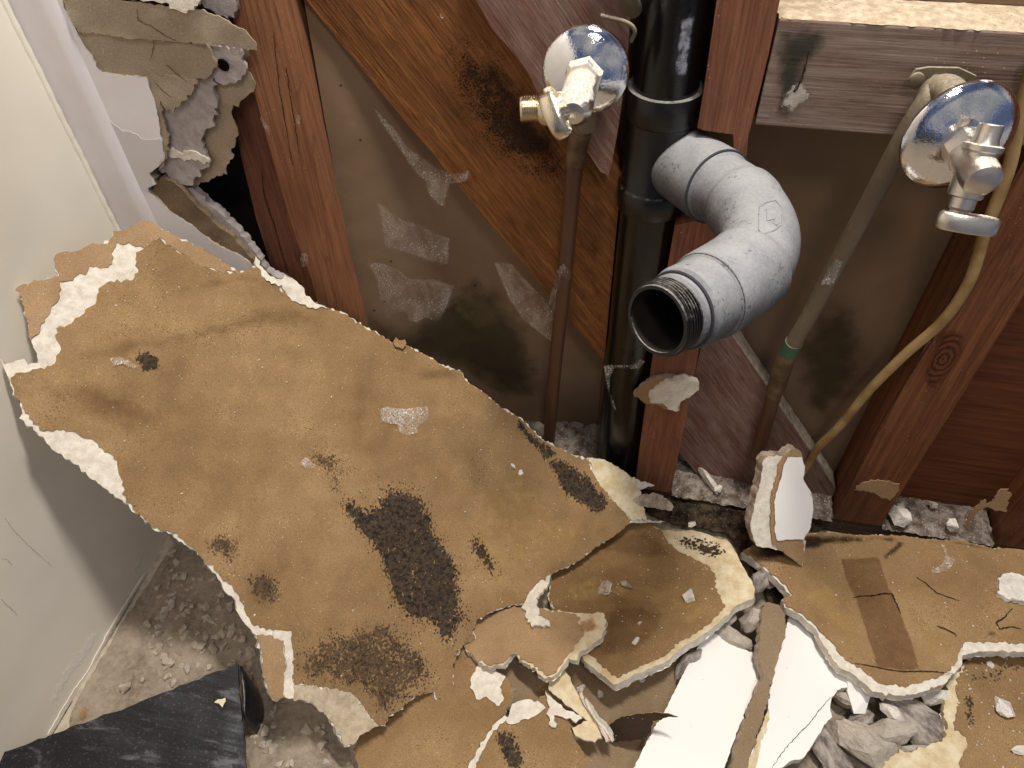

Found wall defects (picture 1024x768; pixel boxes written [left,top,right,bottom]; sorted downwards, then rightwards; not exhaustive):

water stain [444,35,564,184]
water stain [781,33,820,95]
spalling [110,121,257,264]
water stain [408,298,524,389]
water stain [294,442,502,718]
crack [853,592,901,613]
crack [996,608,1021,629]